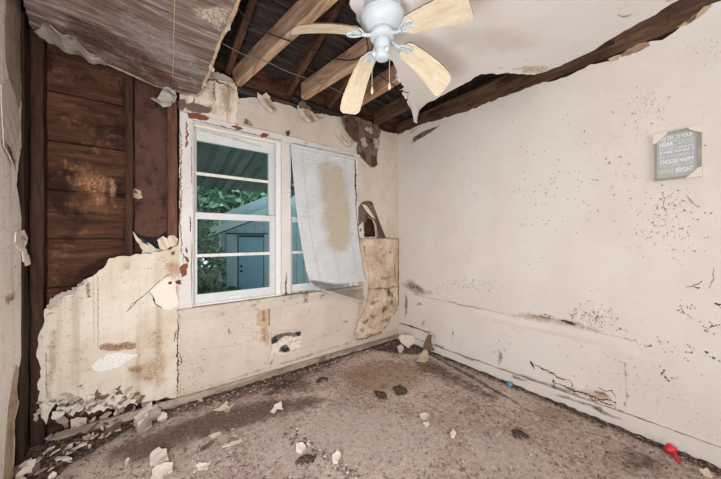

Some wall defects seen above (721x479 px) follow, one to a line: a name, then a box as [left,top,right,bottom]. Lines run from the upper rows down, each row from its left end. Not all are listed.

peeling [676,4,713,28]
peeling [608,42,650,62]
mould [634,185,712,261]
damp [526,301,640,343]
spalling [33,385,145,422]
crack [530,361,616,409]